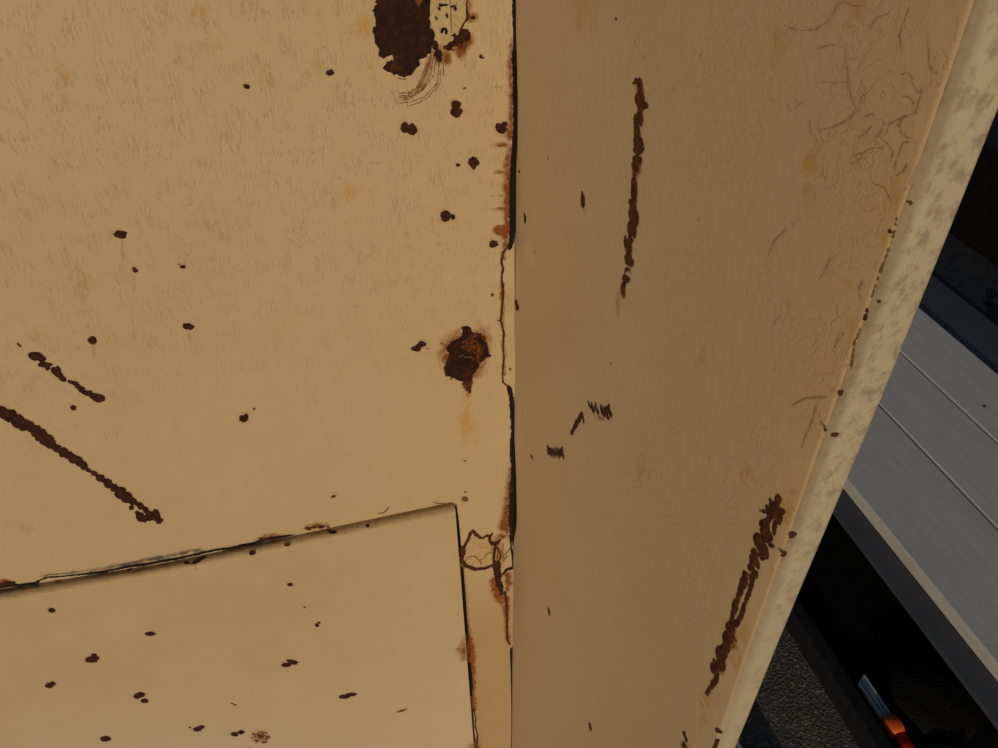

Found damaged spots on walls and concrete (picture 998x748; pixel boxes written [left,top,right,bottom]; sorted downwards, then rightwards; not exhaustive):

peeling [372,0,473,78]
rust [495,122,507,134]
crack [493,0,518,565]
rust [410,326,492,394]
rust [547,444,564,460]
rust [570,401,612,435]
rust [459,529,513,617]
crack [503,591,513,748]
rust [231,730,271,743]